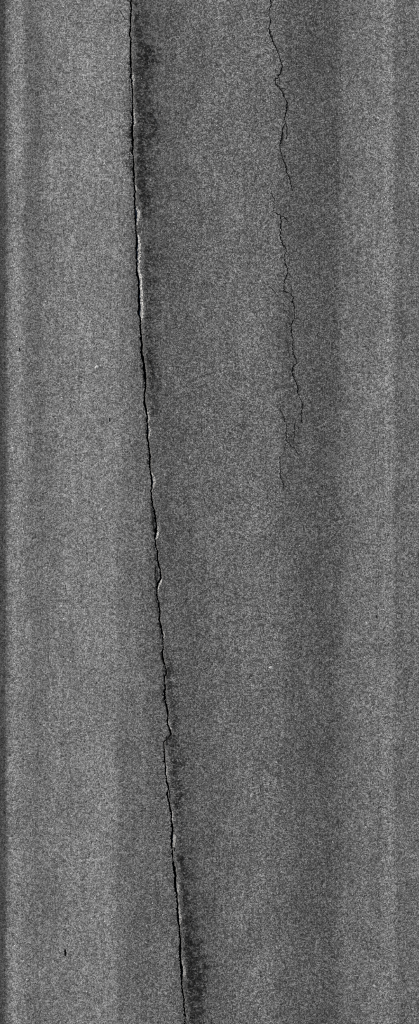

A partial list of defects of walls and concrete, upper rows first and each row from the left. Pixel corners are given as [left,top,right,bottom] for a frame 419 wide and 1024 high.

crack [119,0,186,1024]
crack [268,0,304,491]